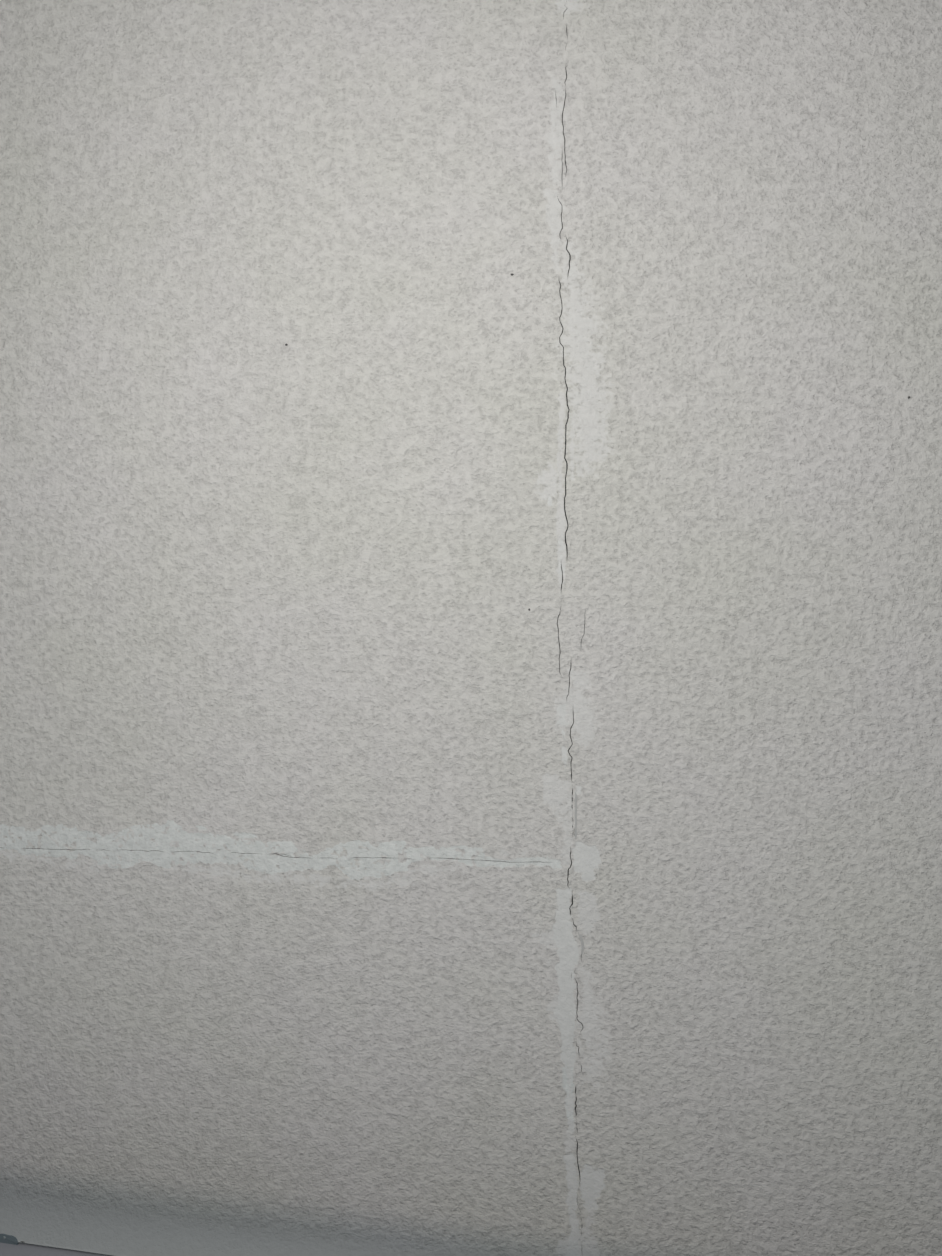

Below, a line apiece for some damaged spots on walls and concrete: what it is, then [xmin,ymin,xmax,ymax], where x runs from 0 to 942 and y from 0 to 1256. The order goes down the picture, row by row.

crack [555,1,585,1245]